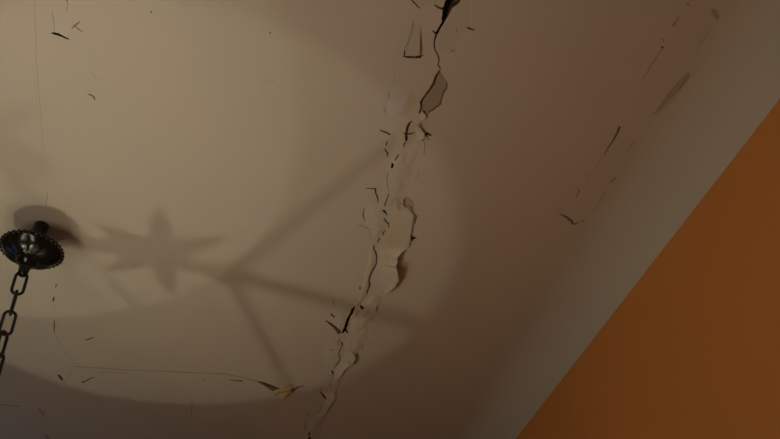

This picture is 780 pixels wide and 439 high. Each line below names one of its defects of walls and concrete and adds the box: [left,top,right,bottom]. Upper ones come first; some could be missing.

crack [34,0,83,152]
crack [58,0,474,429]
peeling [372,236,416,293]